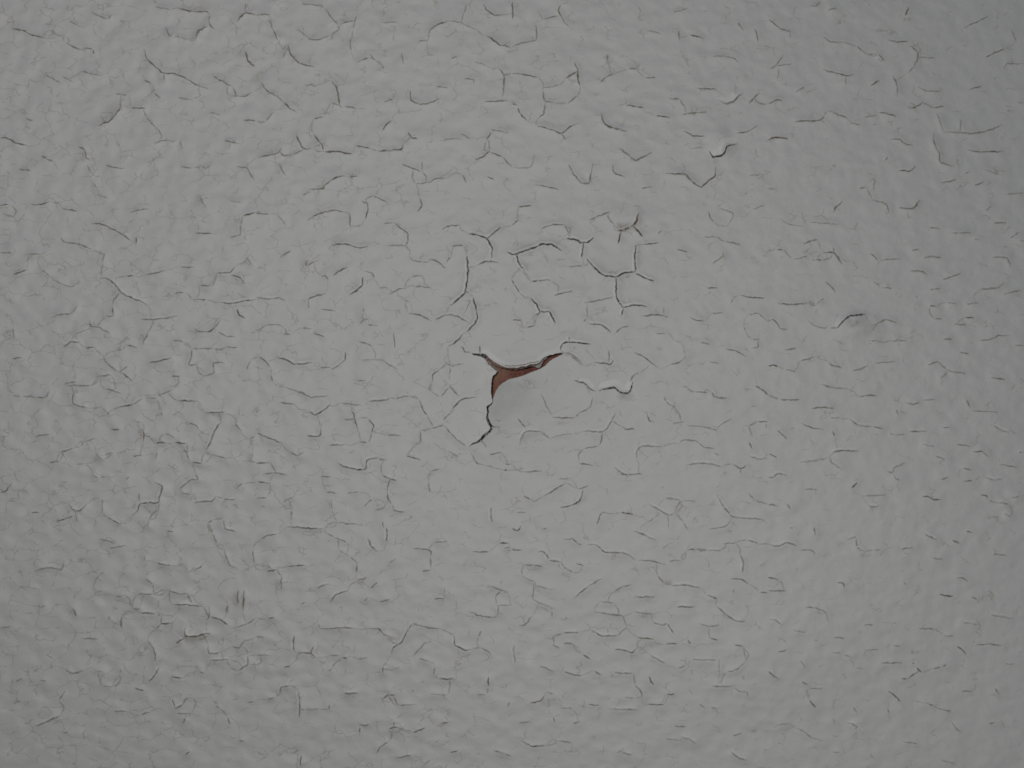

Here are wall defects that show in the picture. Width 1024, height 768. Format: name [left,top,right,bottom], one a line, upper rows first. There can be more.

crack [0,118,54,172]
crack [12,11,112,84]
crack [78,146,125,199]
crack [97,1,717,213]
crack [645,8,739,62]
crack [736,19,1005,186]
crack [0,174,1024,765]
peeling [457,327,637,471]